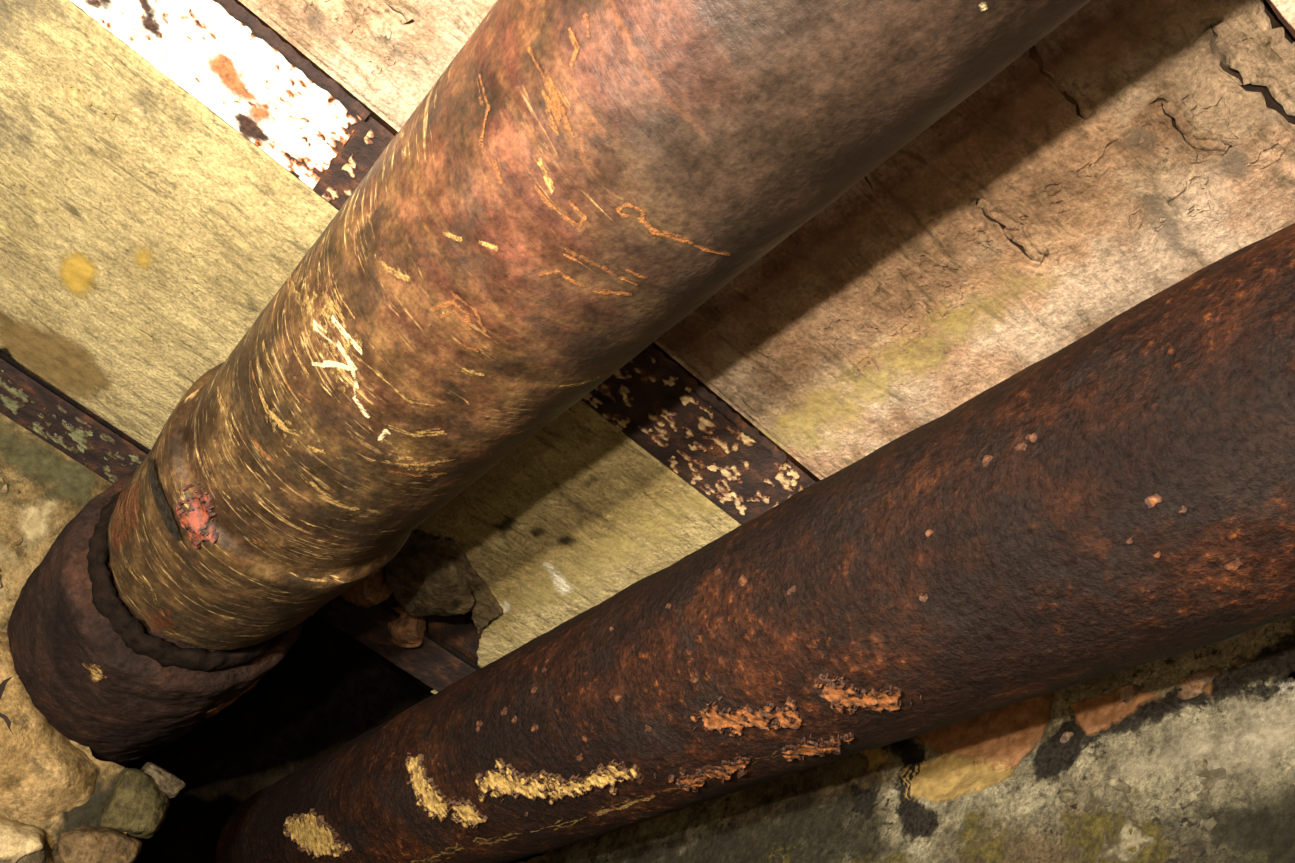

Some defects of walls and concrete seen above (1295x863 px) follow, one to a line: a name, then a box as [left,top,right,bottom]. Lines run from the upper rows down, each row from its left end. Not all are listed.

peeling [70,0,375,202]
crack [1153,101,1229,163]
crack [1194,0,1295,146]
peeling [1270,0,1295,30]
crack [972,199,1044,268]
peeling [582,354,808,515]
rust [1145,494,1163,509]
rust [812,672,921,715]
water stain [1033,627,1295,781]
rust [283,808,352,859]
rust [405,696,854,844]
water stain [586,736,939,863]